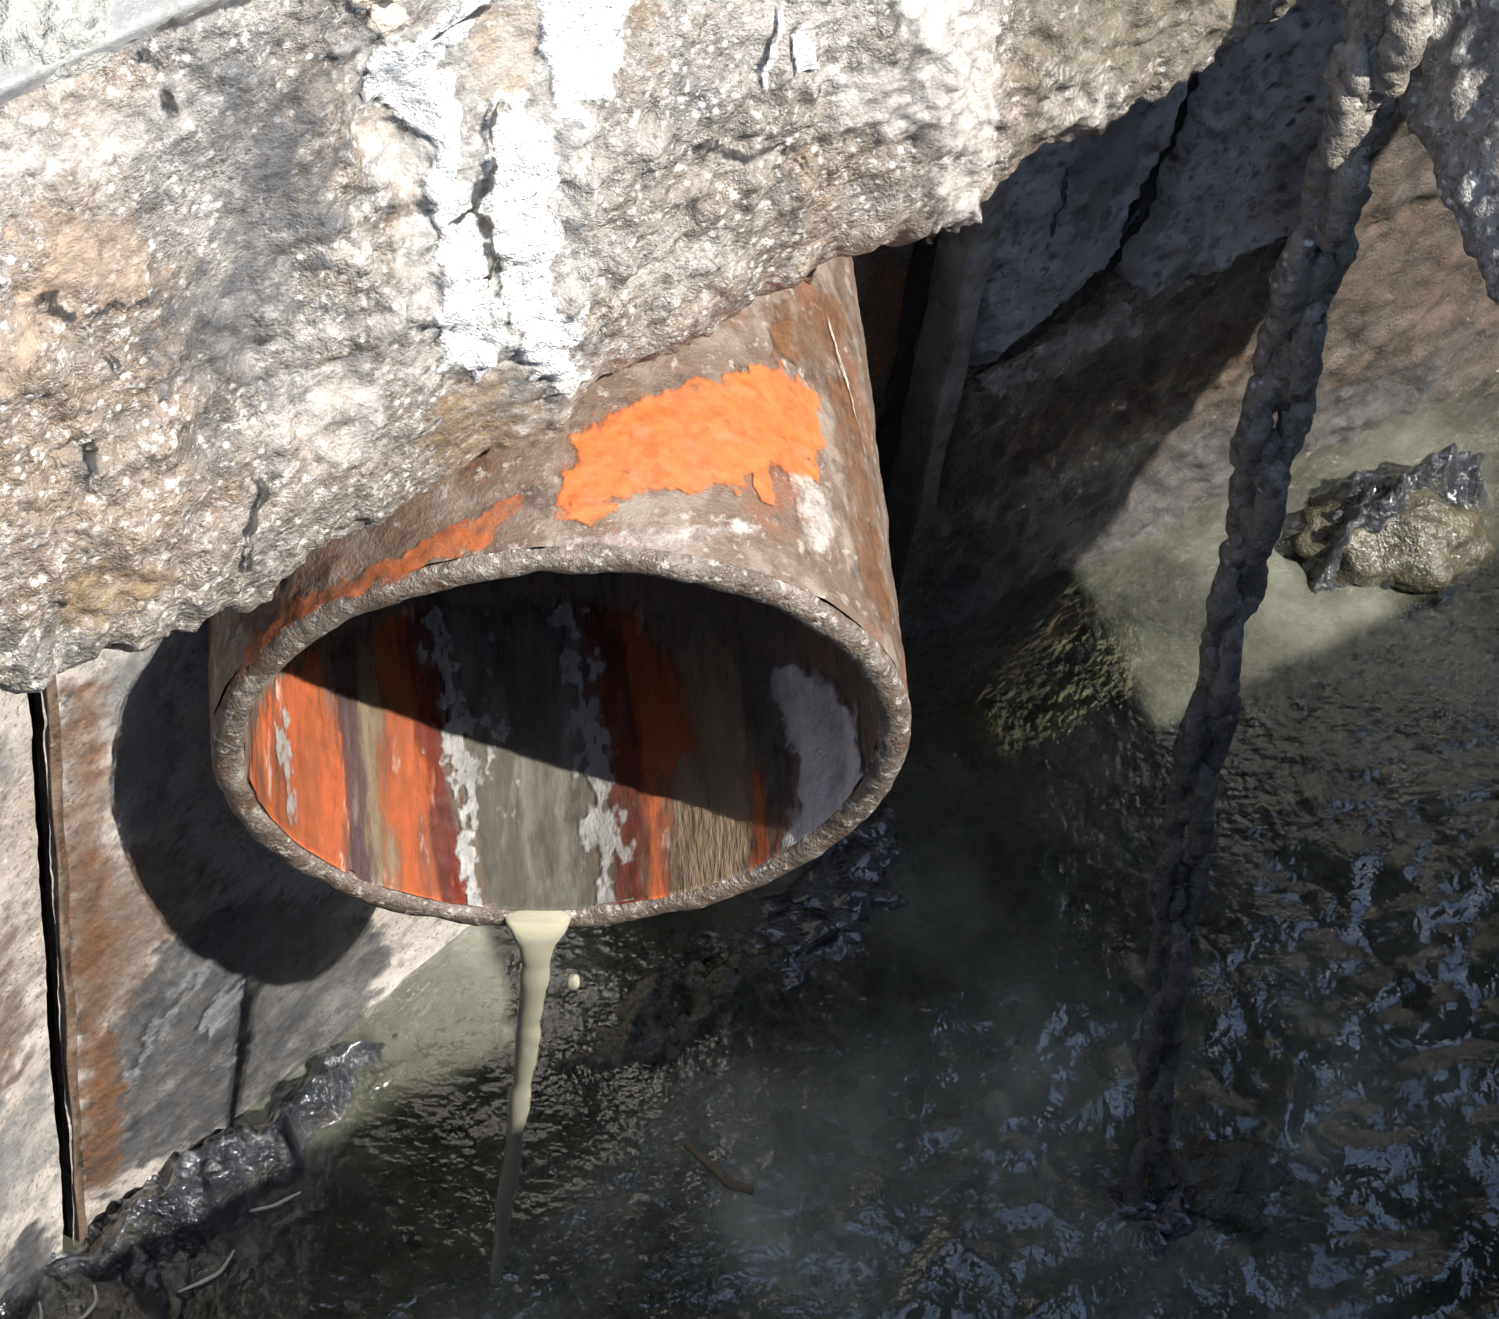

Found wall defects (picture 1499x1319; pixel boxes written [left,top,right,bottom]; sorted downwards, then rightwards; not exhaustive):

crack [447,93,503,313]
leakage [338,0,635,398]
crack [971,73,1200,378]
efflorescence [266,372,330,463]
efflorescence [312,390,379,467]
peeling [752,467,775,505]
rust [397,605,468,905]
rust [574,602,649,904]
rust [57,678,226,1188]